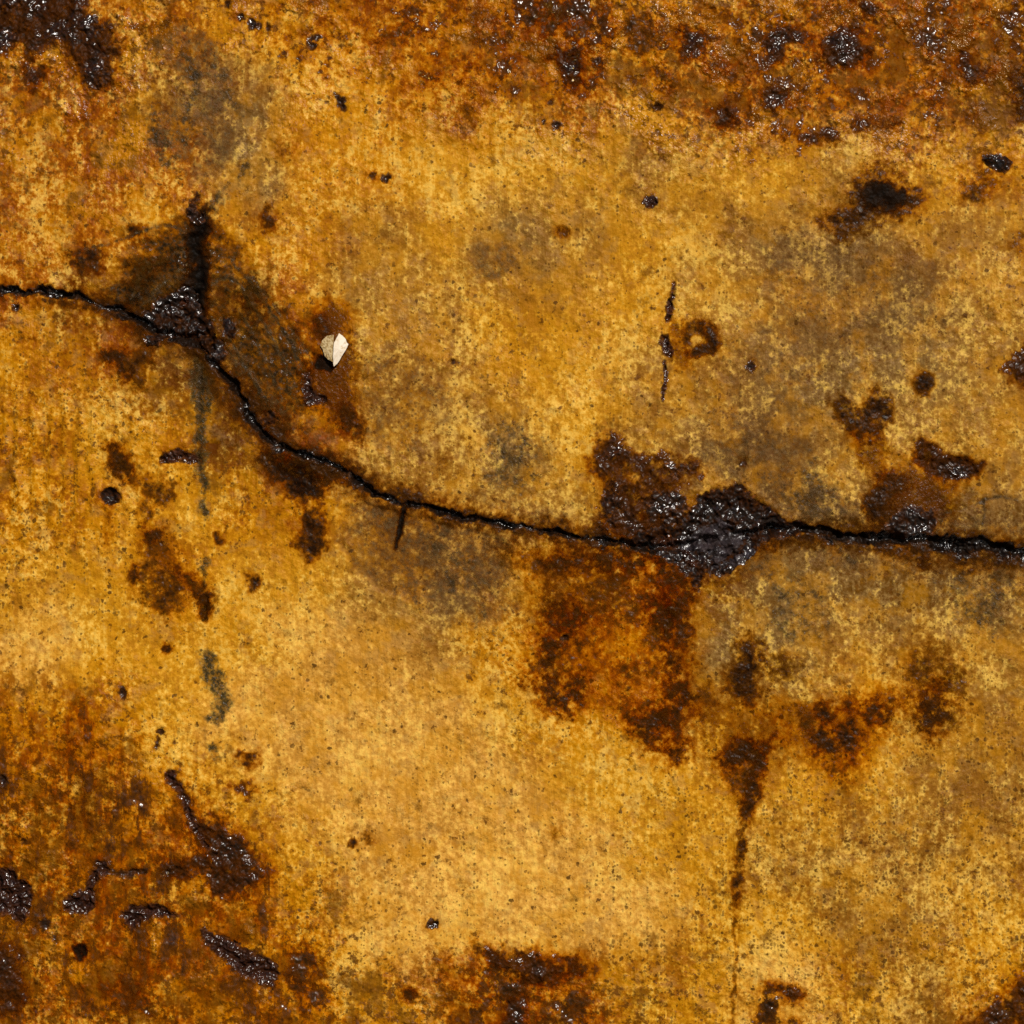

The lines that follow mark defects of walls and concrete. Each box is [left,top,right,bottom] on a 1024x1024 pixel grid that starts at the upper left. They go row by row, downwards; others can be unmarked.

corrosion [0,0,126,93]
corrosion [359,0,901,156]
corrosion [104,443,214,619]
leakage [190,351,216,516]
crack [0,162,655,557]
corrosion [588,432,705,537]
crack [659,281,677,402]
crack [752,495,1024,575]
leakage [201,649,233,724]
corrosion [519,553,803,761]
corrosion [45,708,271,941]
corrosion [442,943,599,1024]